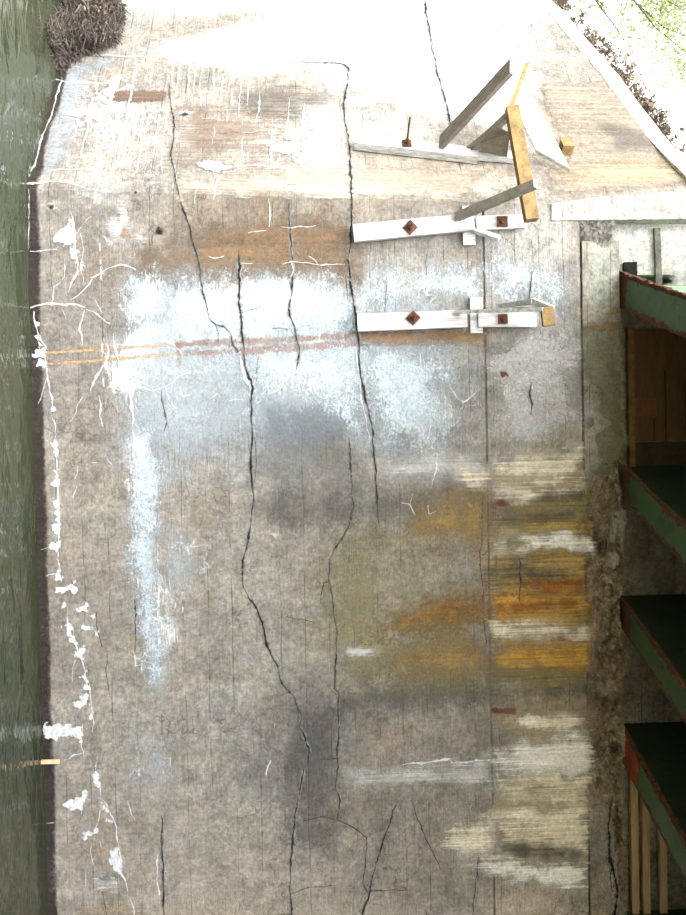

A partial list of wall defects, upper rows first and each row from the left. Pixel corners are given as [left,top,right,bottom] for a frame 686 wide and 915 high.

water stain [70,55,166,176]
water stain [171,57,481,233]
water stain [26,61,136,915]
crack [161,392,169,431]
rust [45,328,488,365]
crack [168,61,441,915]
water stain [90,245,628,700]
rust [331,537,596,684]
spalling [583,449,627,915]
crack [159,817,167,915]
water stain [349,704,596,893]
crack [605,797,620,915]